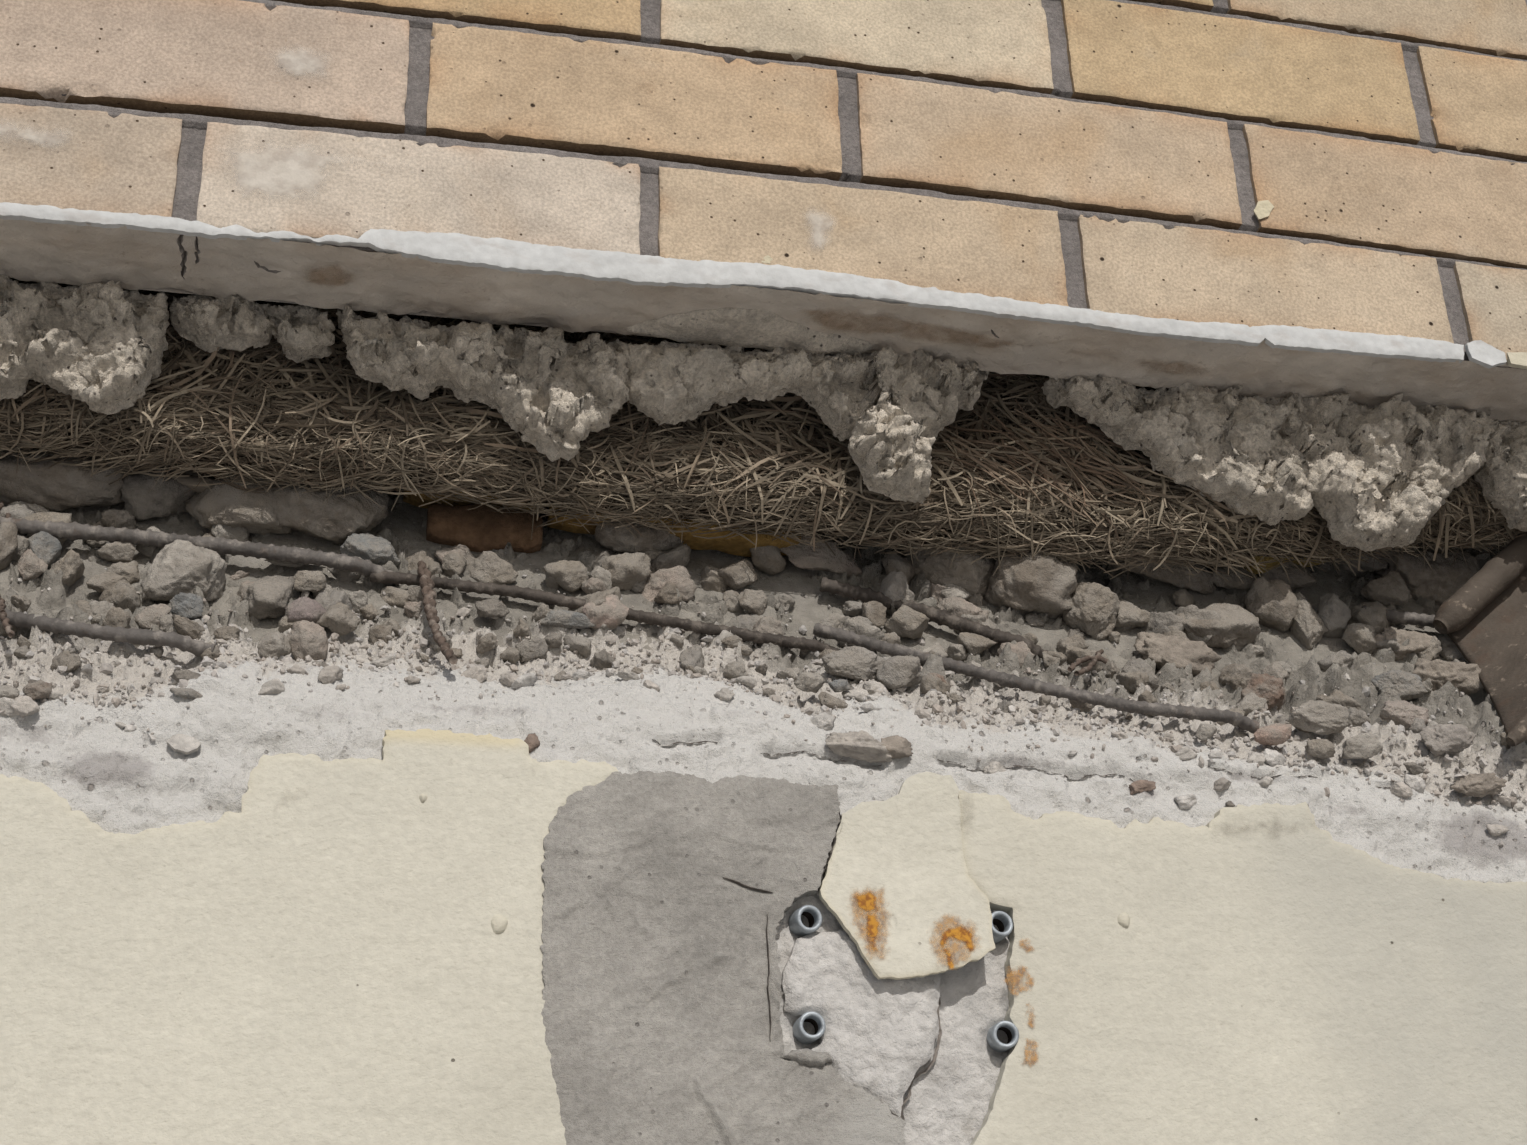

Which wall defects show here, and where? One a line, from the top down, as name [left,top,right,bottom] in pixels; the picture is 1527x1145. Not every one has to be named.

crack [177,234,201,278]
spalling [0,482,1527,1145]
crack [818,812,842,892]
corrosion [853,892,885,958]
corrosion [936,917,974,968]
corrosion [1005,940,1033,994]
crack [900,998,942,1121]
corrosion [1025,1018,1038,1064]